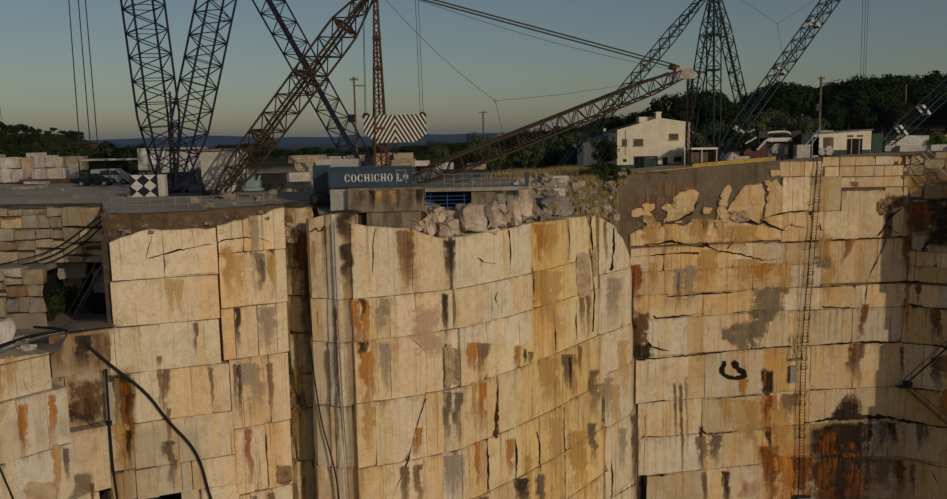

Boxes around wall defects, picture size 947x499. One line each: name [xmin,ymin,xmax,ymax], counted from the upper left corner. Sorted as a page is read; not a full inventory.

damp [907,198,947,245]
spalling [576,246,598,297]
crack [478,202,947,345]
damp [722,287,783,350]
rust [351,299,376,440]
rust [467,343,490,364]
rust [18,404,28,444]
rust [48,395,61,482]
crack [392,398,427,499]
damp [812,395,929,499]
spalling [23,481,59,499]
damp [516,474,546,499]